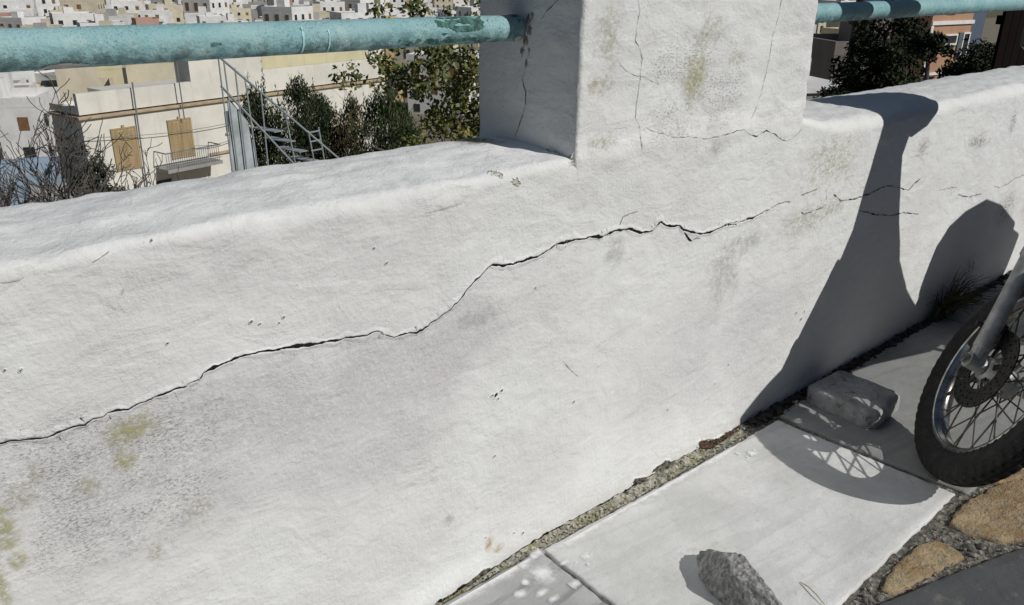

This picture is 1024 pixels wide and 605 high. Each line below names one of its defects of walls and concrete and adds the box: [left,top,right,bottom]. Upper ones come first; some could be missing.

crack [620,1,796,149]
crack [0,153,1023,446]